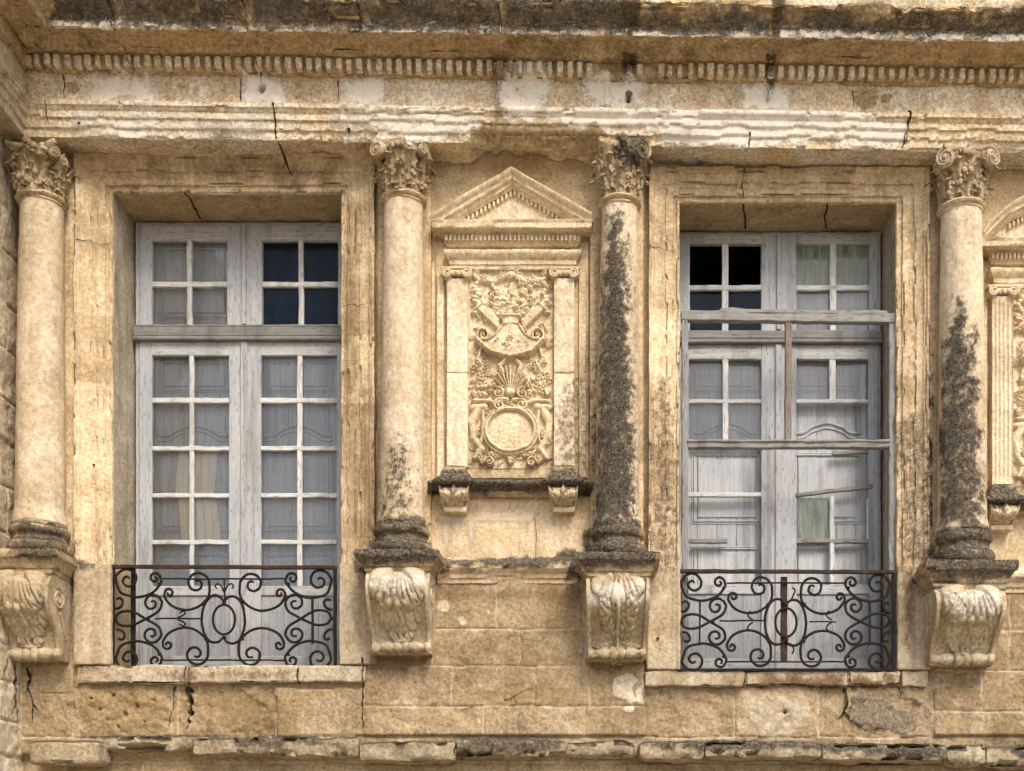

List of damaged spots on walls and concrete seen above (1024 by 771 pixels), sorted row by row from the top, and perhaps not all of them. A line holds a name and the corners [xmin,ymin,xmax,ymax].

damp [48,0,1024,42]
crack [240,56,294,176]
crack [902,110,912,147]
crack [741,131,751,229]
damp [427,364,656,609]
damp [908,374,1024,616]
crack [2,657,40,724]
crack [168,666,194,730]
peeling [612,672,644,713]
crack [838,688,914,735]
spalling [847,690,917,734]